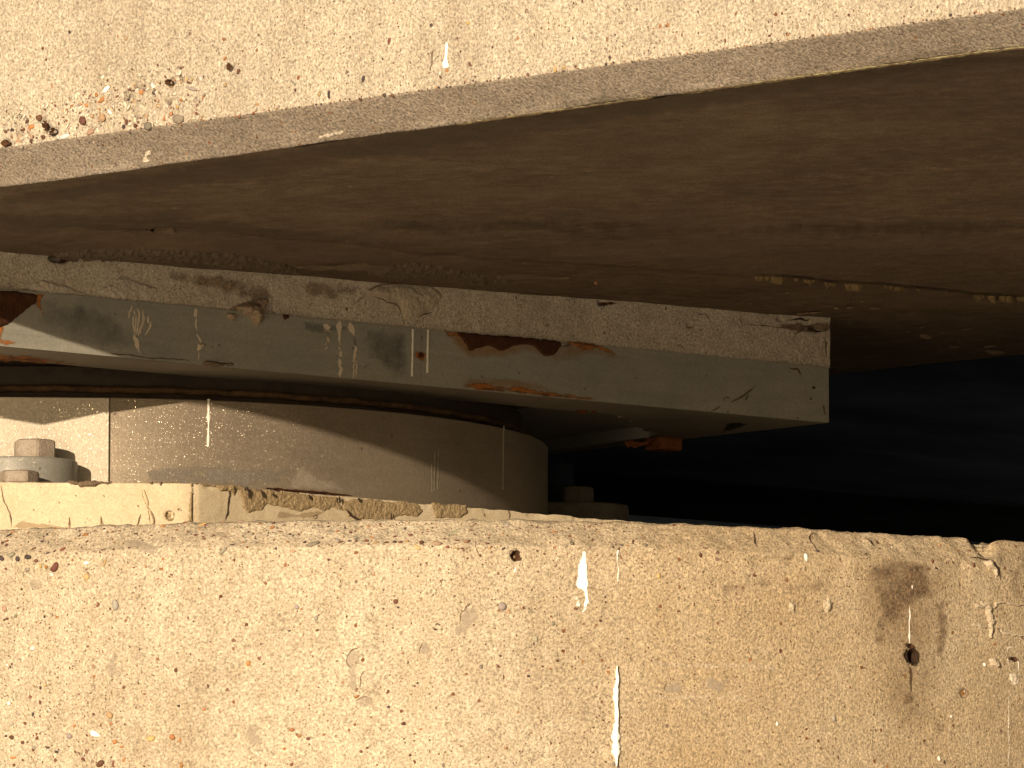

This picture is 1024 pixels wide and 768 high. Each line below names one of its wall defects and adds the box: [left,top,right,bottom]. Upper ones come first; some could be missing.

corrosion [0,289,62,364]
corrosion [447,332,614,356]
spalling [0,482,650,566]
efflorescence [572,551,589,612]
water stain [876,562,929,643]
efflorescence [611,630,621,767]